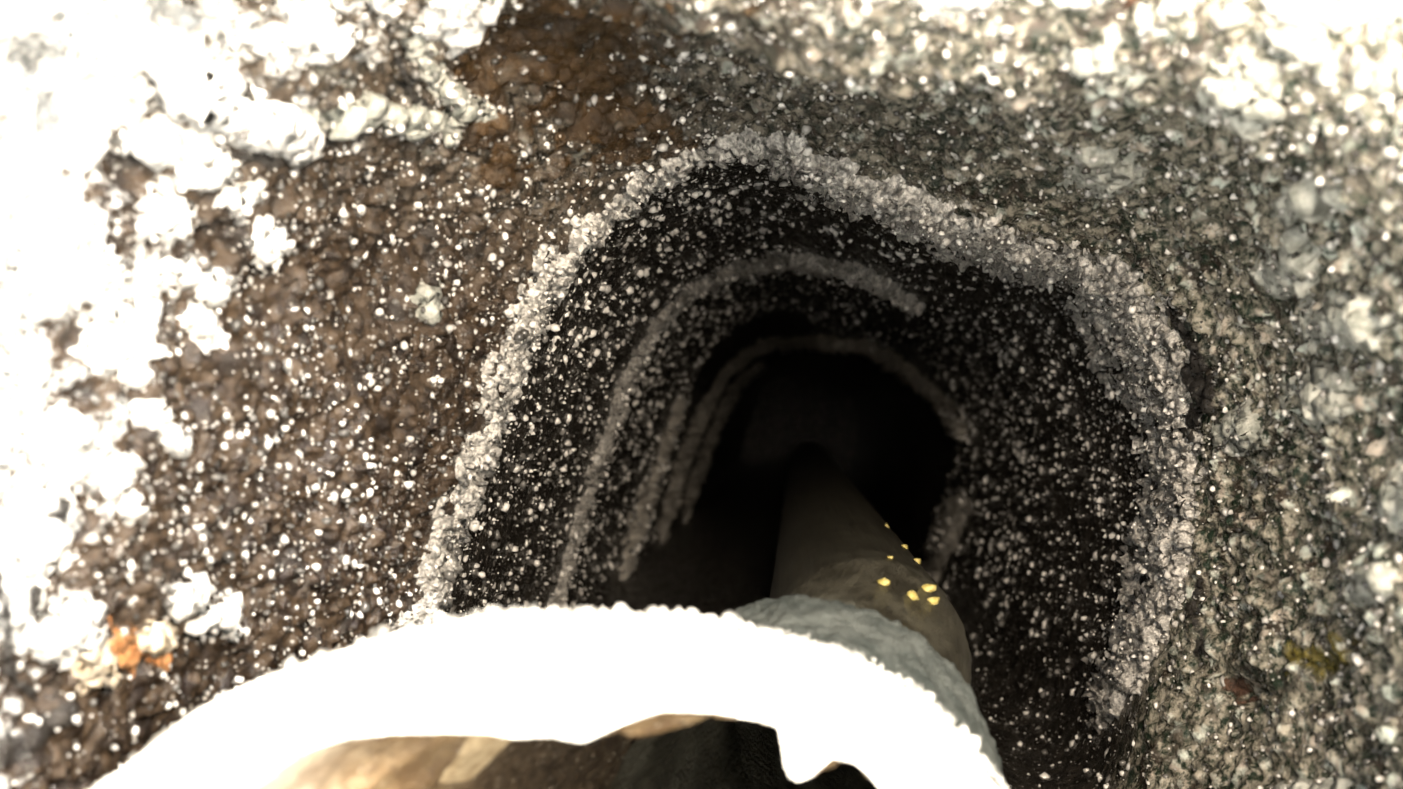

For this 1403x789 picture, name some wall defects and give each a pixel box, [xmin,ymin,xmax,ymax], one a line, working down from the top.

spalling [1058,40,1132,89]
spalling [1186,0,1403,142]
spalling [1061,145,1150,200]
spalling [53,0,506,459]
spalling [1249,175,1403,431]
spalling [1210,396,1264,463]
spalling [97,451,148,526]
spalling [1377,466,1403,535]
spalling [0,401,122,695]
flaking render [134,571,245,658]
spalling [1343,559,1399,607]
peeling [439,734,514,783]